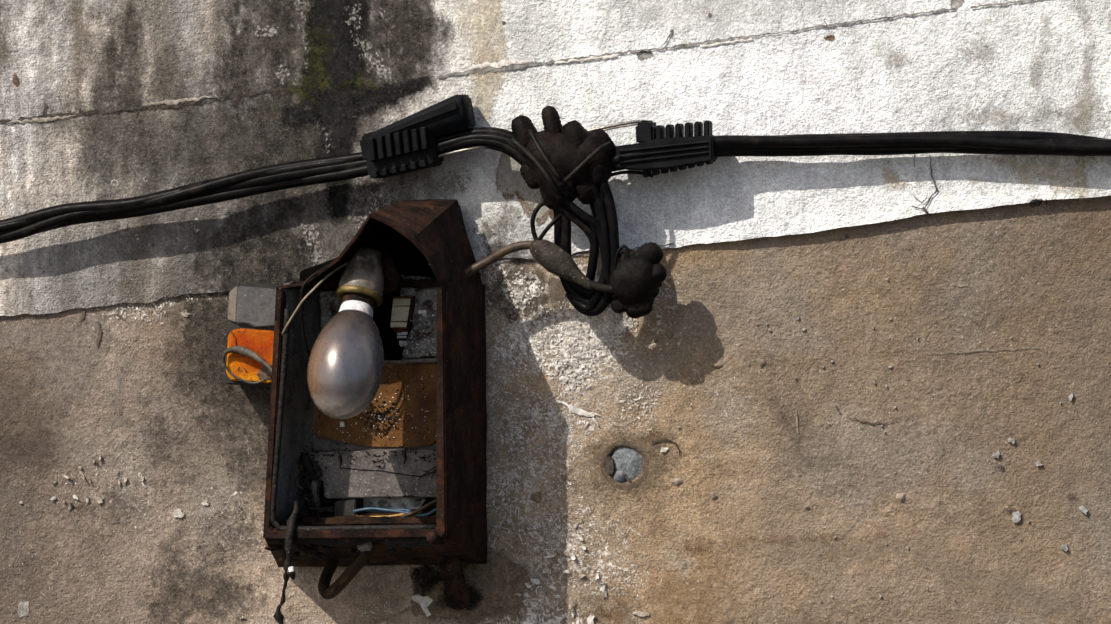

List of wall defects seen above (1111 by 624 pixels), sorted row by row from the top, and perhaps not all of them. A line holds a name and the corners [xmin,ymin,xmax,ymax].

crack [358,0,1034,96]
crack [0,85,302,124]
damp [58,0,508,198]
crack [912,154,938,216]